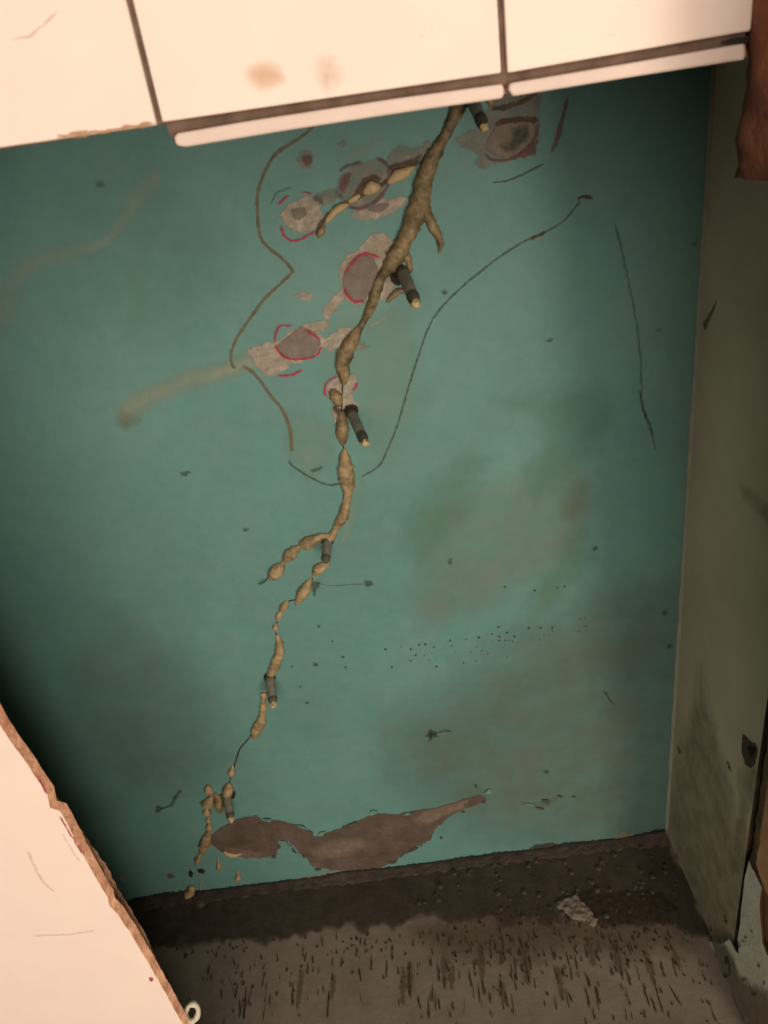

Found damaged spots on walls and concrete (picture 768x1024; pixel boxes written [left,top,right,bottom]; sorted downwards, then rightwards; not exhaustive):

flaking render [457,92,542,168]
flaking render [280,141,430,233]
crack [315,161,419,235]
flaking render [247,232,394,376]
peeling [211,785,492,871]